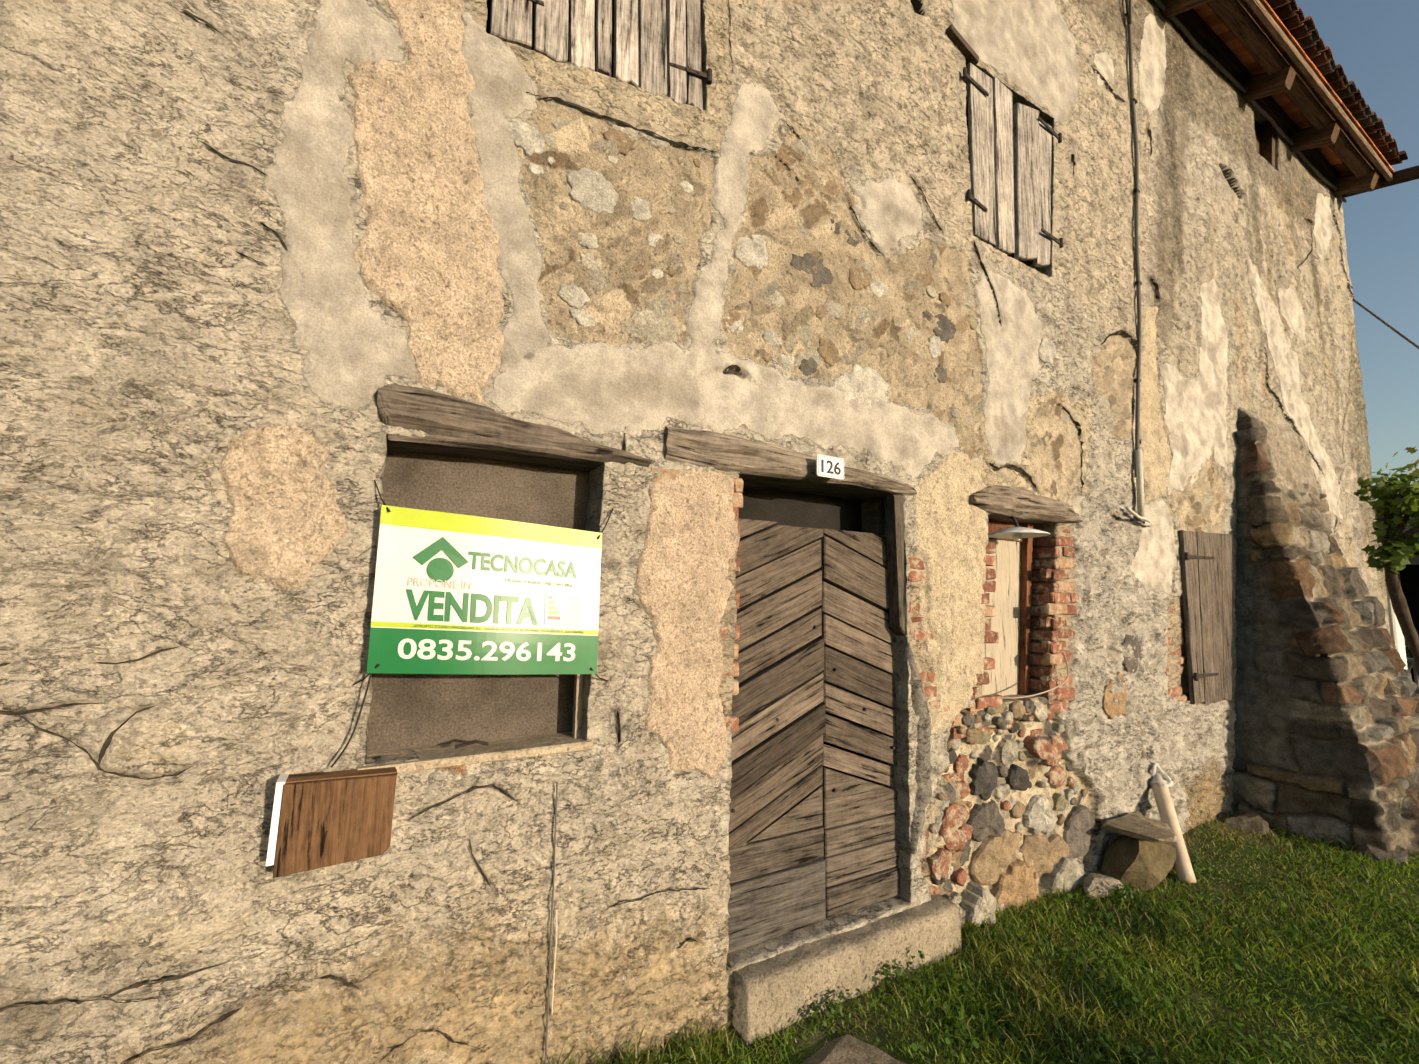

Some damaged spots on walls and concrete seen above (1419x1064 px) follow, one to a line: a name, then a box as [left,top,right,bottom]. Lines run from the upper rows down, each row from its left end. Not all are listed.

flaking render [509,89,714,347]
flaking render [721,116,1121,927]
crack [96,647,177,665]
crack [0,703,192,780]
crack [124,999,251,1064]